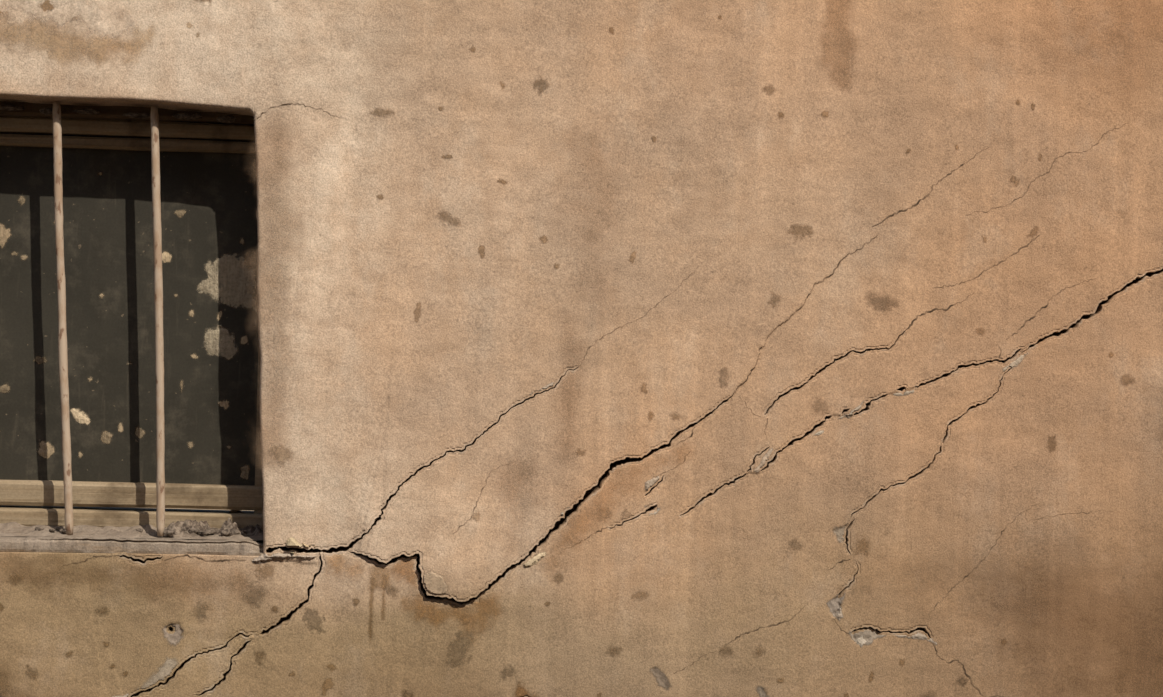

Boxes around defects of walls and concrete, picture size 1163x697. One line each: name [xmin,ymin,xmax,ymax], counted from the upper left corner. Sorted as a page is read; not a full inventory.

peeling [0,0,136,37]
crack [254,102,345,121]
crack [966,122,1129,216]
crack [61,147,1163,697]